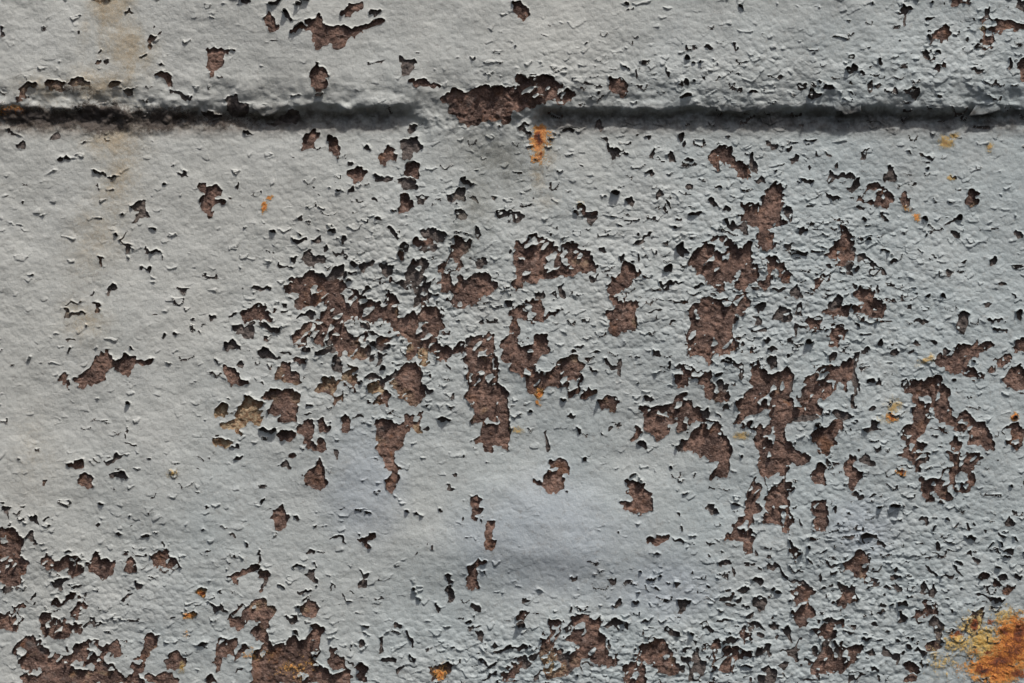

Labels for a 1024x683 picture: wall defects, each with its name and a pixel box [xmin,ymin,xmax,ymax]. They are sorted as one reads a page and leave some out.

peeling [261,0,387,97]
corrosion [527,123,554,166]
peeling [27,346,171,395]
peeling [162,40,1024,683]
peeling [0,502,399,683]
corrosion [927,603,1024,683]